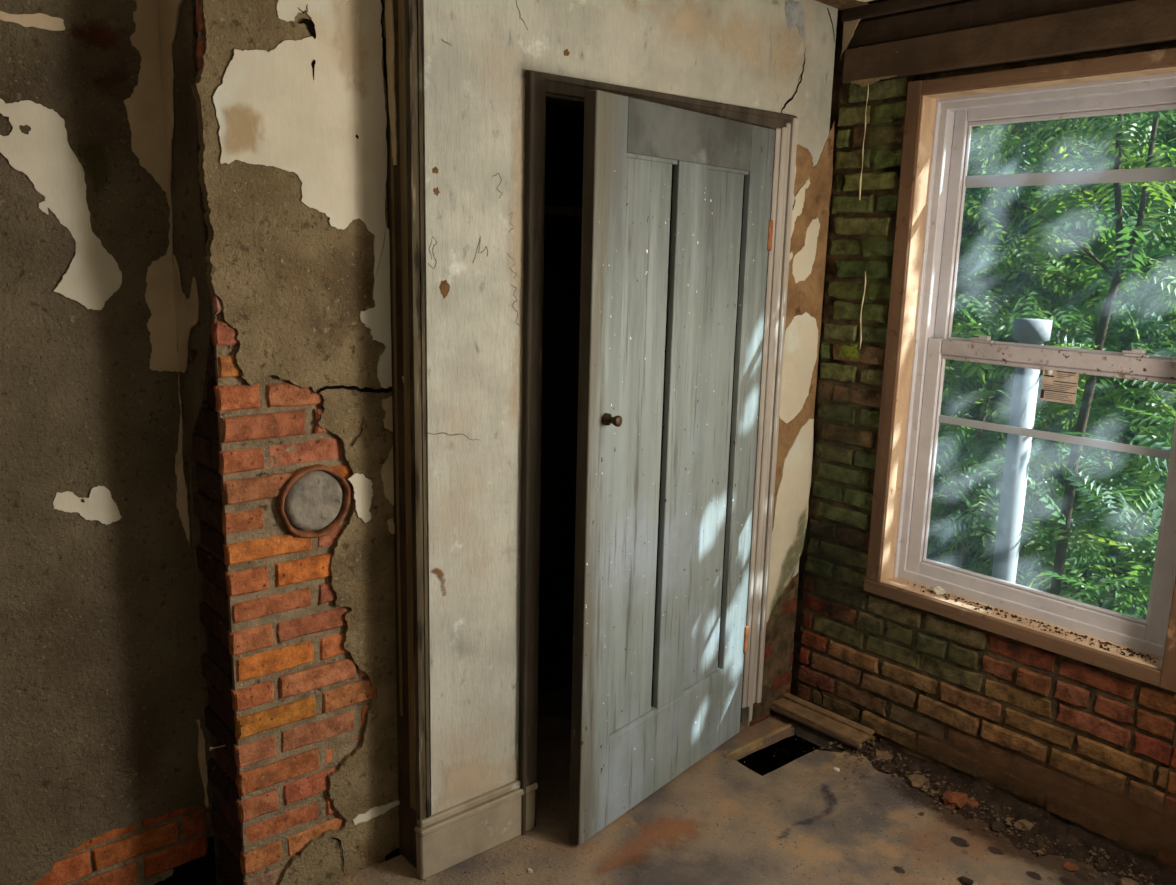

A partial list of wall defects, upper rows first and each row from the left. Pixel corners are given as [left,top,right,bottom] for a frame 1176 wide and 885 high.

peeling [0,11,65,31]
peeling [0,99,122,310]
peeling [53,485,122,525]
flaking render [124,0,404,885]
crack [317,385,392,446]
leakage [771,514,861,614]
flaking render [749,75,1176,872]
flaking render [33,719,209,885]